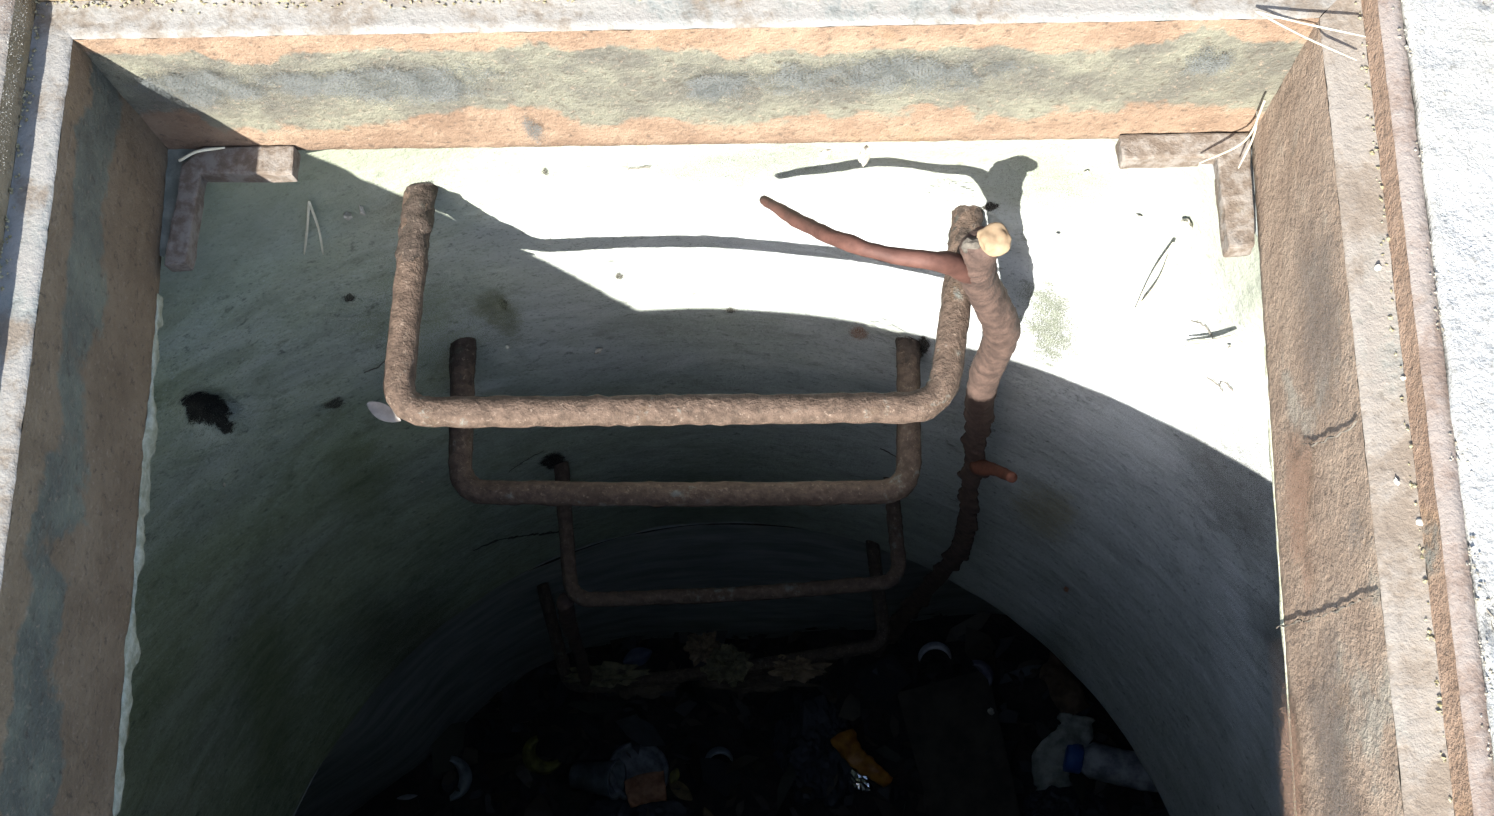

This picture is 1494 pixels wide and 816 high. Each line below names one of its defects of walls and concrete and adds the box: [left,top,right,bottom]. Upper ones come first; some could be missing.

rust [395,182,438,275]
rust [947,203,984,245]
rust [449,337,477,386]
rust [895,335,922,368]